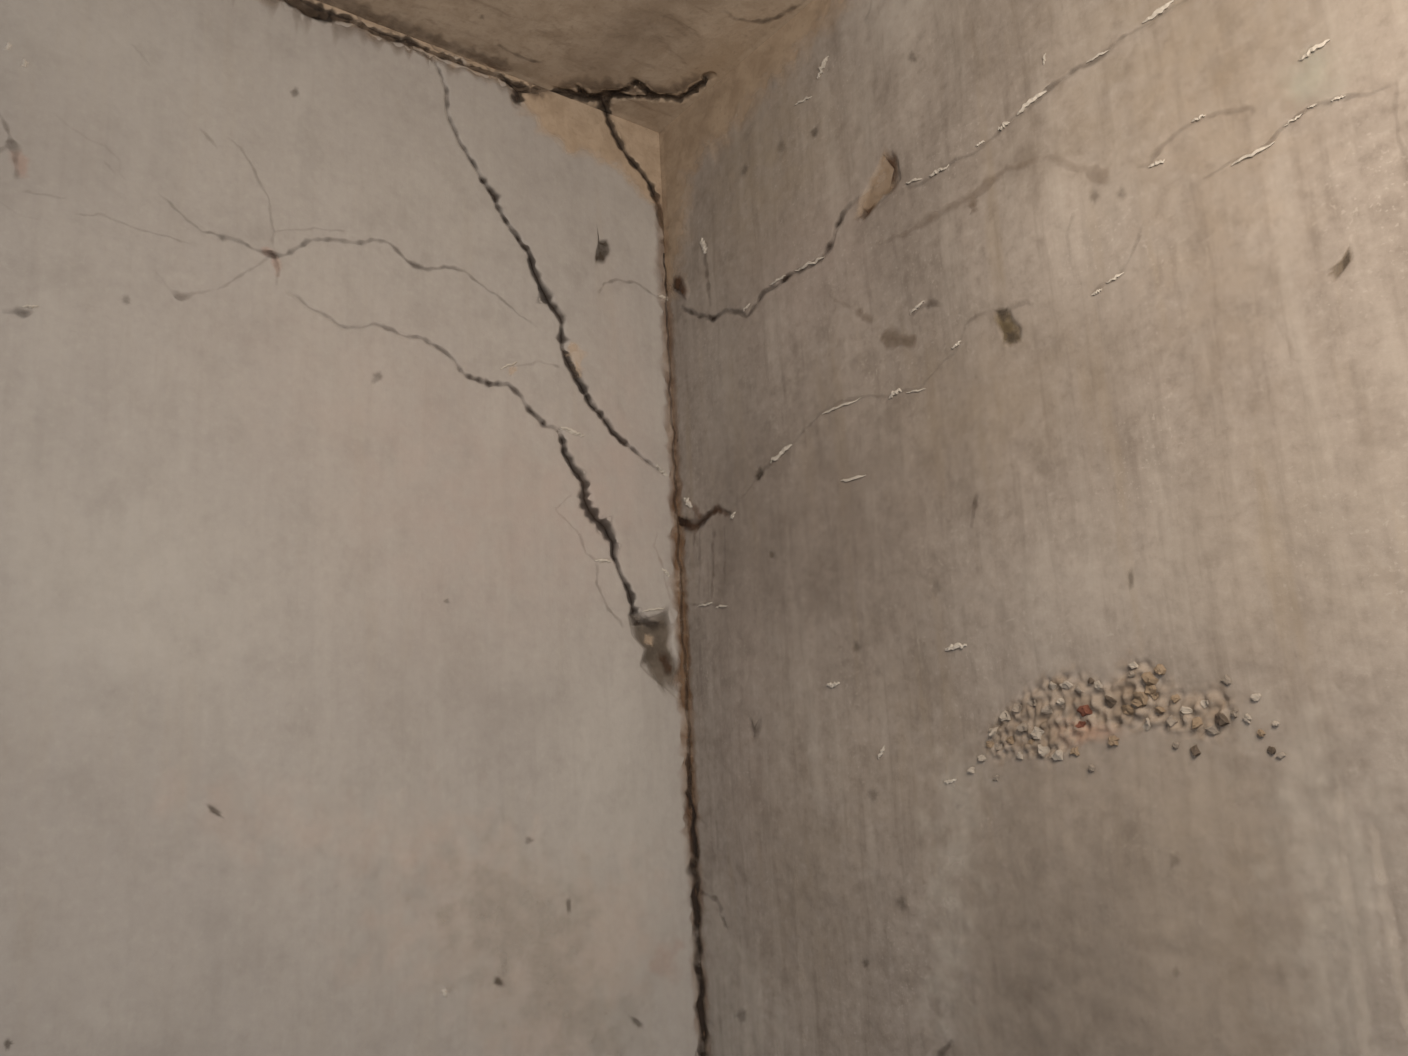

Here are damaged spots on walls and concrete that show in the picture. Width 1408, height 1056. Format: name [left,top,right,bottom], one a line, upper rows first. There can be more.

crack [1142,0,1174,24]
peeling [305,0,842,284]
peeling [862,155,897,216]
crack [905,90,1047,185]
crack [1148,159,1165,168]
crack [1231,95,1346,166]
crack [1091,272,1124,296]
crack [822,388,925,415]
crack [284,0,843,1056]
flaking render [634,614,677,686]
flaking render [944,662,1286,784]